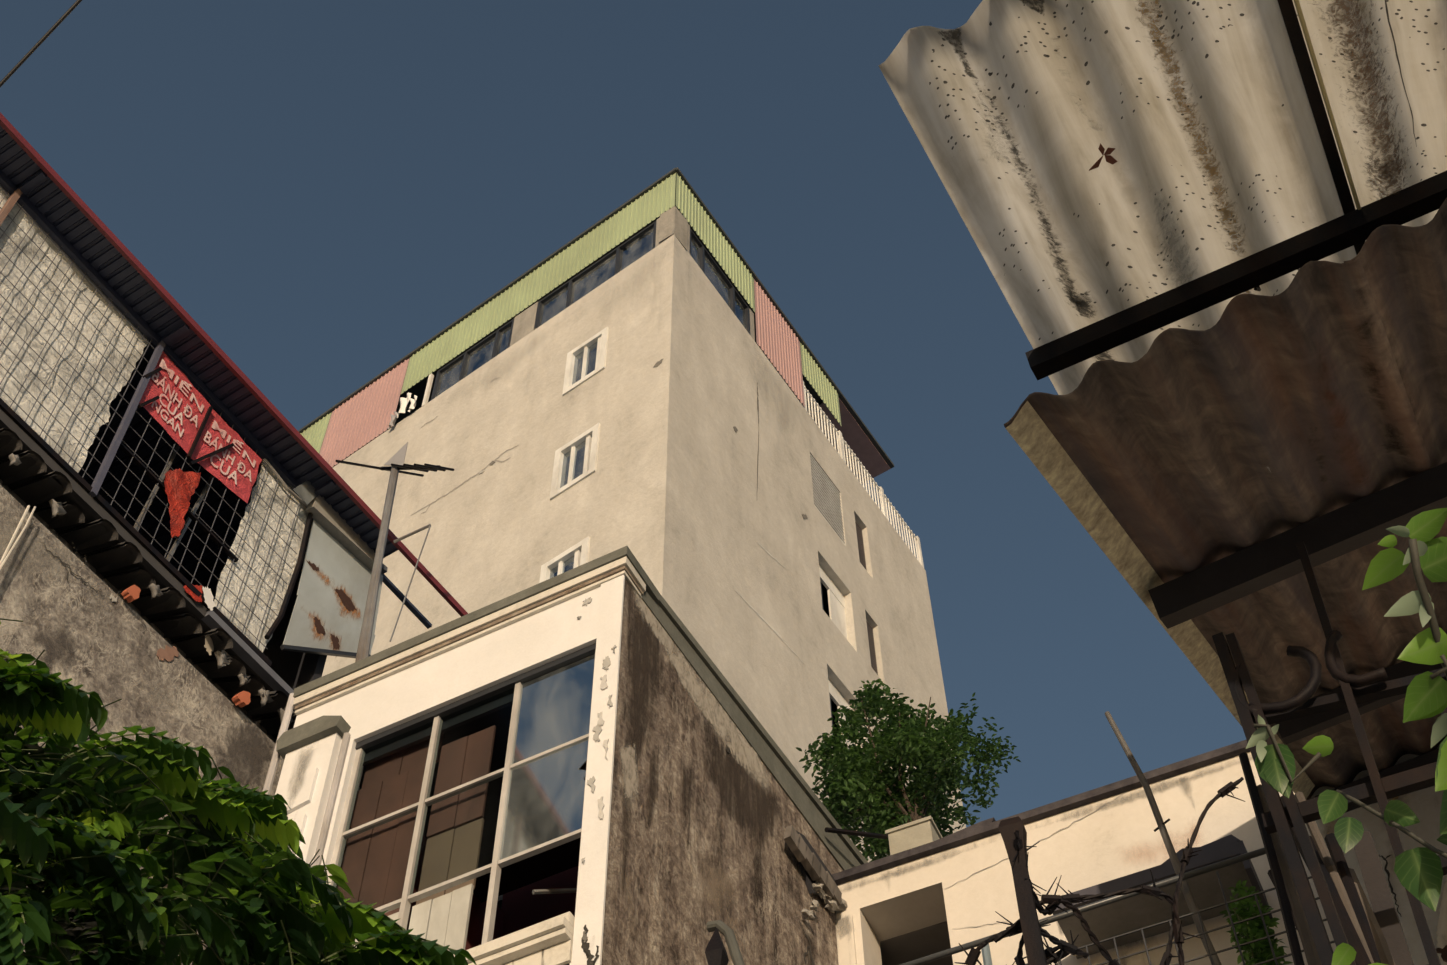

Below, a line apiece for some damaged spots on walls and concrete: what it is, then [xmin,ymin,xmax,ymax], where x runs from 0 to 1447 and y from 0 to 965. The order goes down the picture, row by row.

leakage [1364,160,1405,199]
leakage [1066,292,1095,317]
corrosion [307,561,360,617]
corrosion [309,614,340,650]
peeling [592,645,638,800]
leakage [622,603,662,825]
peeling [634,591,769,787]
peeling [587,776,604,819]
leakage [683,769,691,845]
leakage [704,722,777,902]
crack [581,925,600,965]